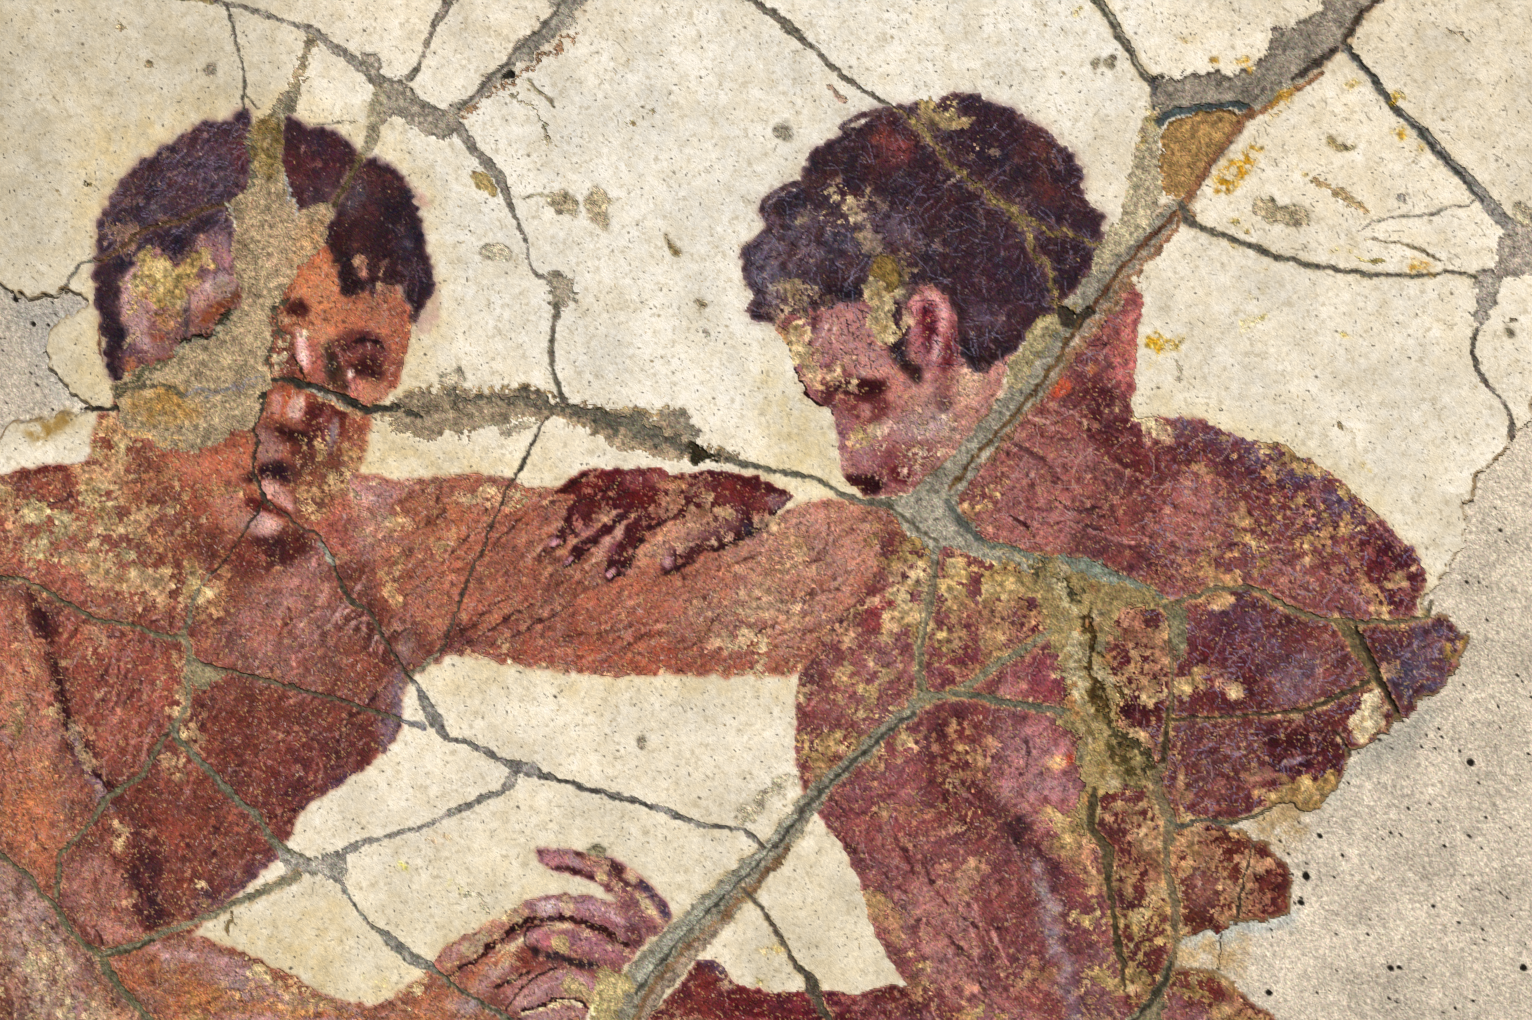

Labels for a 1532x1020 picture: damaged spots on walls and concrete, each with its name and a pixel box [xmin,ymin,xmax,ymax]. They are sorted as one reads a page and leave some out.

crack [62,203,225,292]
crack [175,0,589,415]
spalling [1311,177,1371,215]
crack [97,320,105,364]
spalling [0,35,335,625]
crack [724,0,1532,717]
peeling [1251,442,1381,523]
peeling [1339,550,1416,621]
crack [0,390,927,1020]
peeling [1349,685,1391,744]
crack [1066,557,1435,1020]
peeling [1254,770,1340,812]